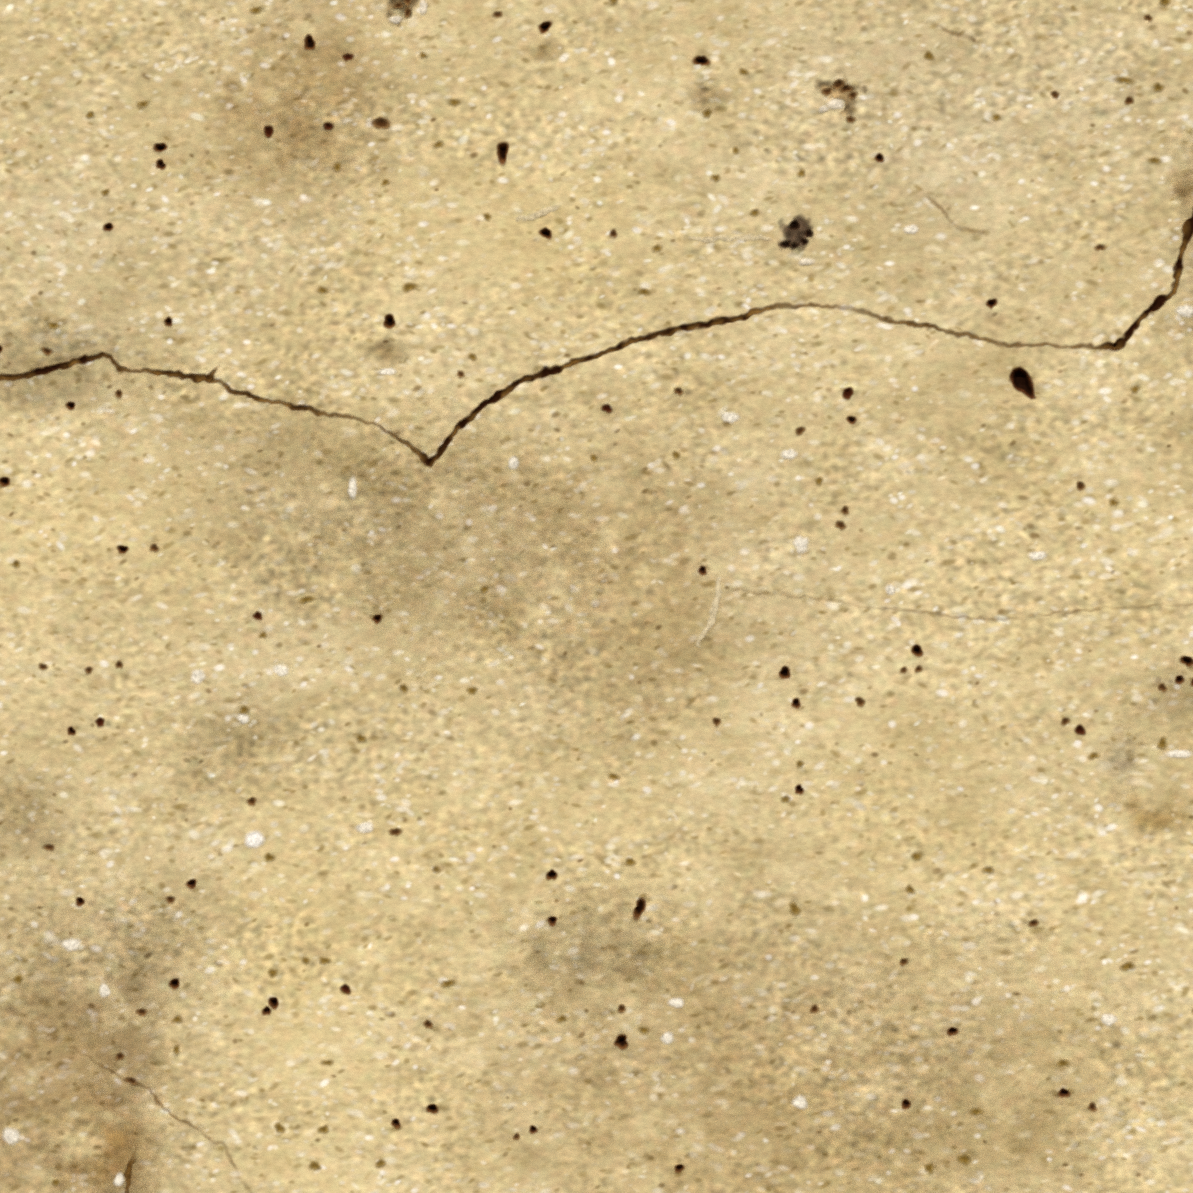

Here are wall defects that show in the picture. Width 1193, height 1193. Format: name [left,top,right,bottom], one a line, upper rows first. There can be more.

crack [0,215,1193,467]